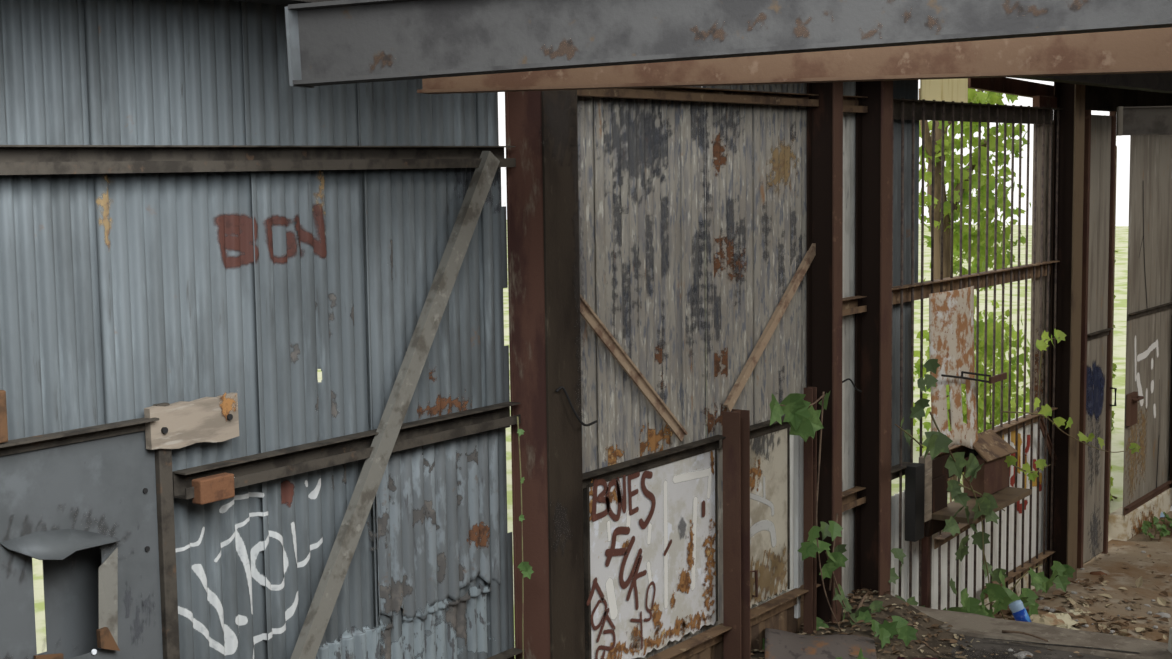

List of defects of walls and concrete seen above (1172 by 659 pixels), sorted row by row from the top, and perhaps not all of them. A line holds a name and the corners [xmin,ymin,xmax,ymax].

corrosion [711,133,727,176]
water stain [611,159,669,400]
water stain [686,116,746,379]
corrosion [714,231,747,281]
water stain [762,177,802,293]
corrosion [929,286,978,456]
peeling [367,475,397,551]
peeling [413,500,440,530]
peeling [456,449,478,505]
corrosion [639,423,673,457]
peeling [315,552,494,659]
corrosion [601,519,716,659]